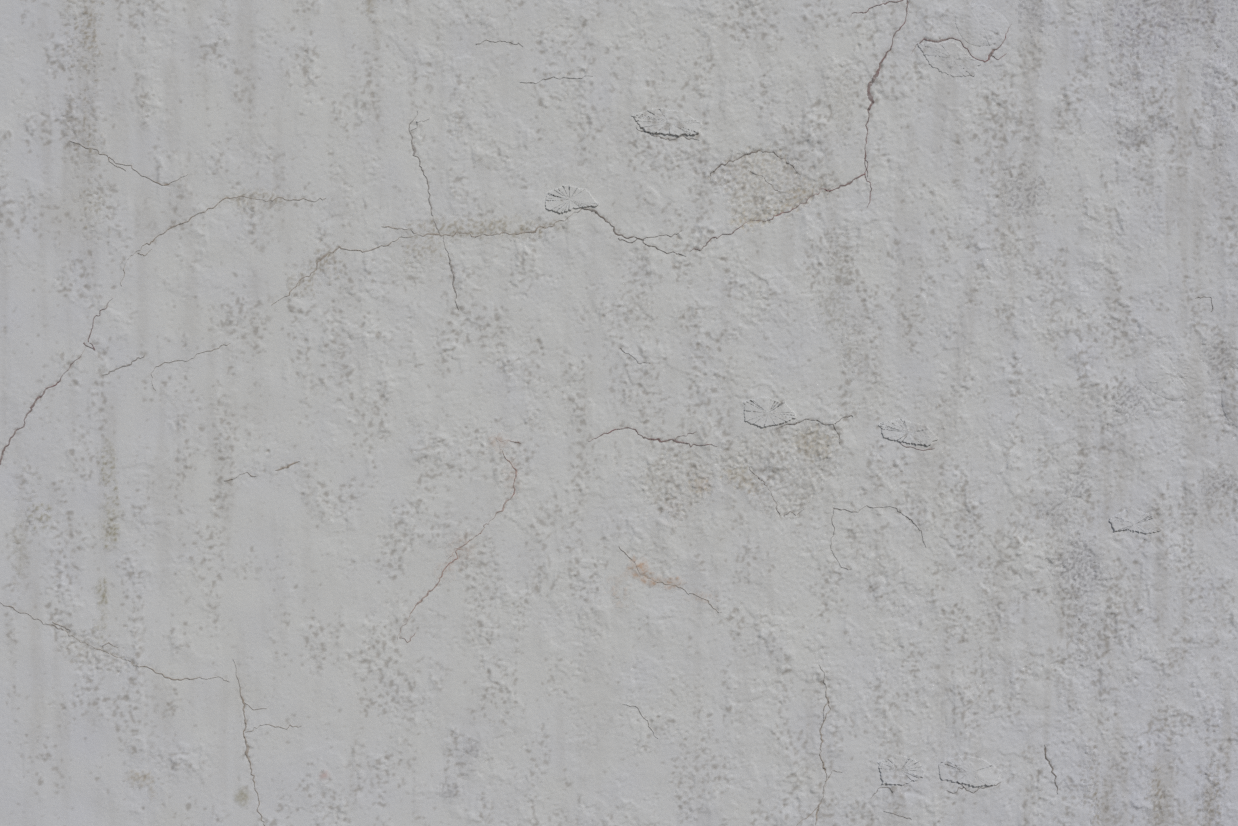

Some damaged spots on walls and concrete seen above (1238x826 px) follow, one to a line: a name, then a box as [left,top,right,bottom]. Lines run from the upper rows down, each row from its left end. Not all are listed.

crack [71,141,181,186]
crack [273,0,1011,307]
crack [0,196,320,465]
crack [226,461,299,481]
crack [396,438,520,642]
crack [9,606,300,826]